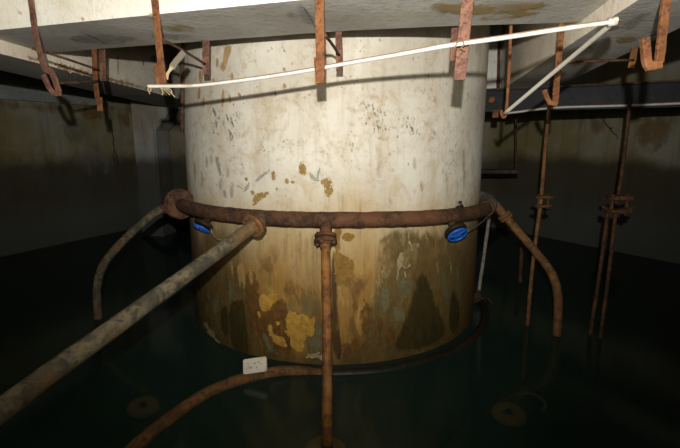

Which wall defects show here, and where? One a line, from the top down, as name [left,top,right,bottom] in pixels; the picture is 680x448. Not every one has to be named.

water stain [434,3,461,14]
water stain [472,3,545,20]
corrosion [216,45,231,70]
water stain [396,230,419,281]
corrosion [200,263,291,353]
corrosion [332,231,465,359]
water stain [396,275,459,350]